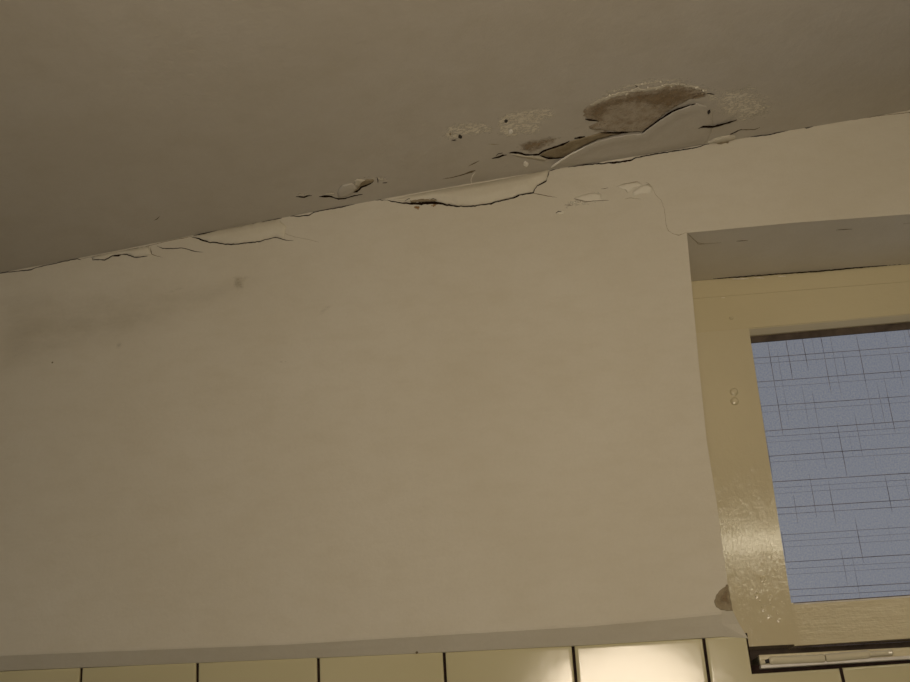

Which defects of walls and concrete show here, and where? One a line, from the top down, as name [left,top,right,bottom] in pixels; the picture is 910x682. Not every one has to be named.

spalling [510,79,714,167]
crack [600,103,696,134]
peeling [296,177,387,200]
crack [379,120,736,207]
crack [0,204,354,274]